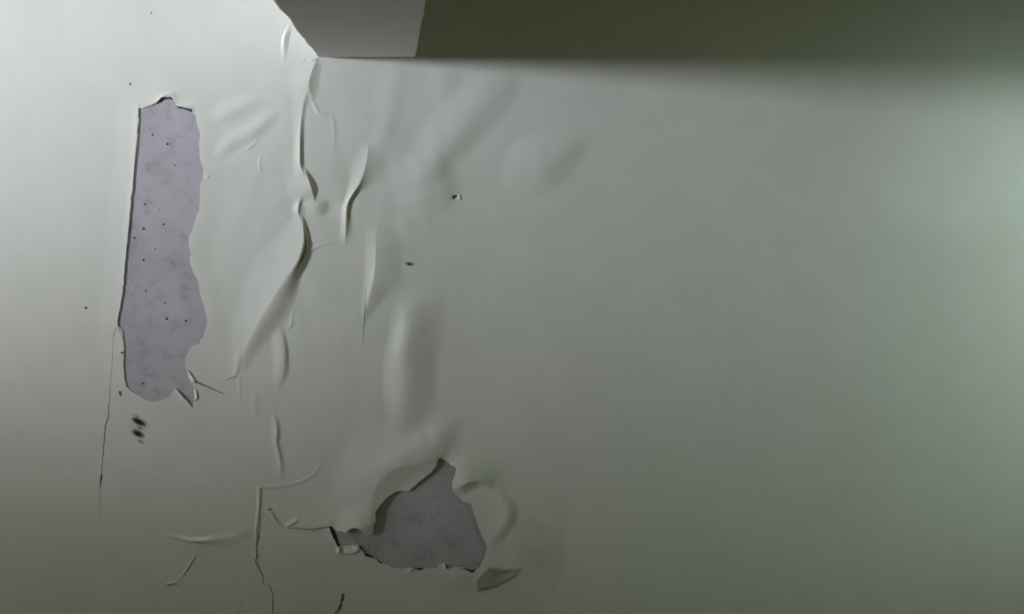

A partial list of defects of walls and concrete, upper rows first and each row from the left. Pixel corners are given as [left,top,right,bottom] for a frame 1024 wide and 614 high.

peeling [96,74,231,430]
crack [99,327,117,516]
crack [255,508,274,612]
peeling [308,418,521,596]